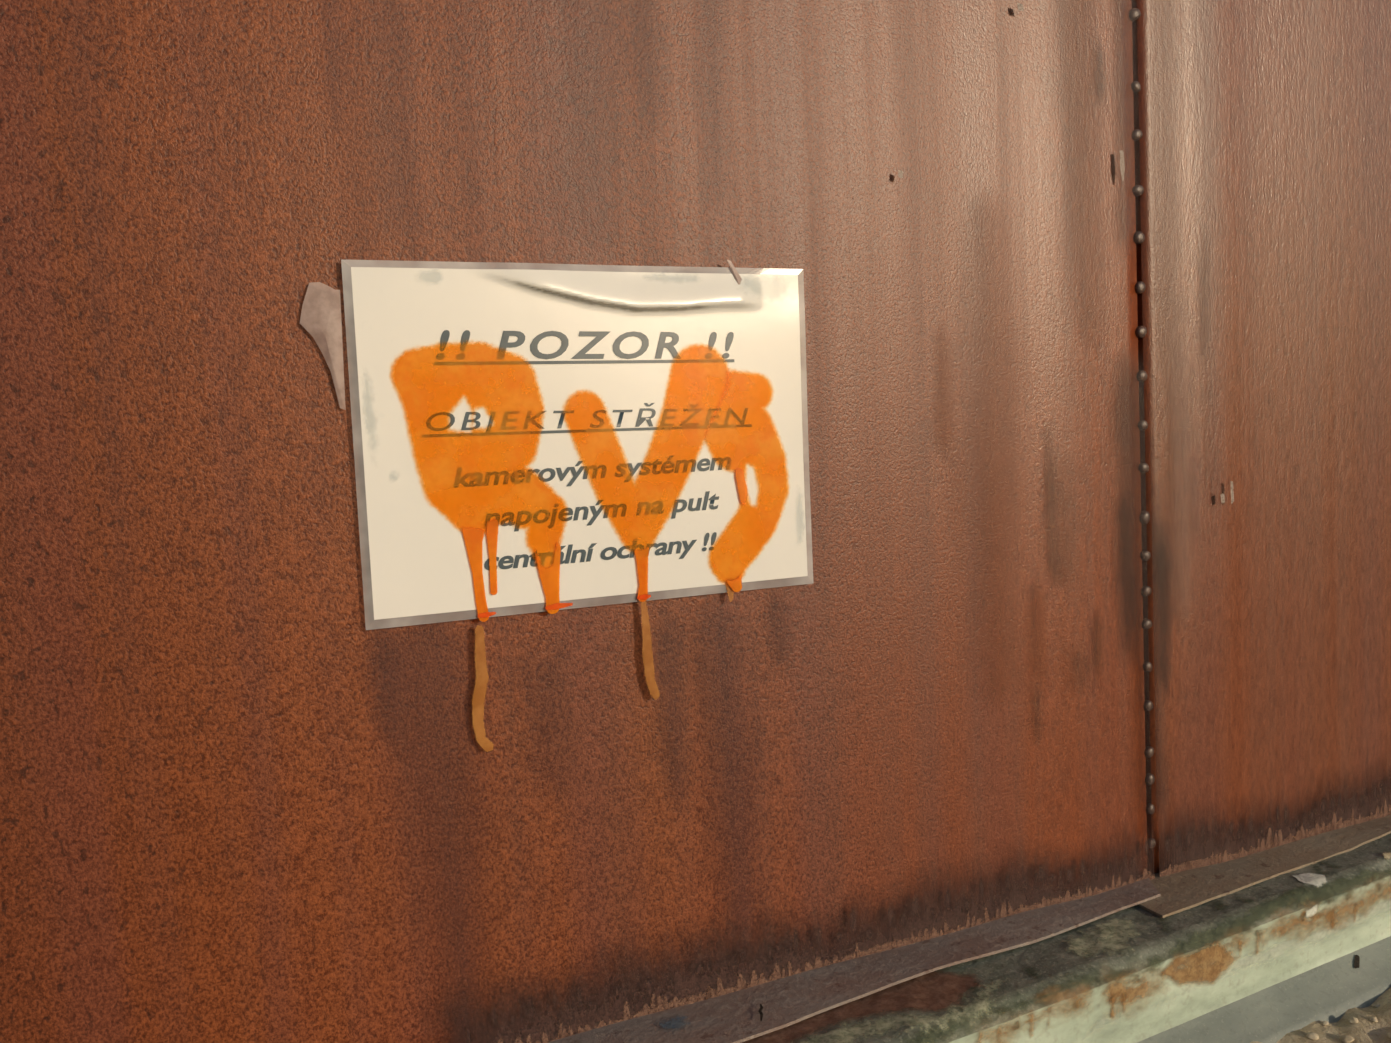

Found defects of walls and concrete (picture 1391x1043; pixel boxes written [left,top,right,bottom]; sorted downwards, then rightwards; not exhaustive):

damp [453,779,1391,1043]